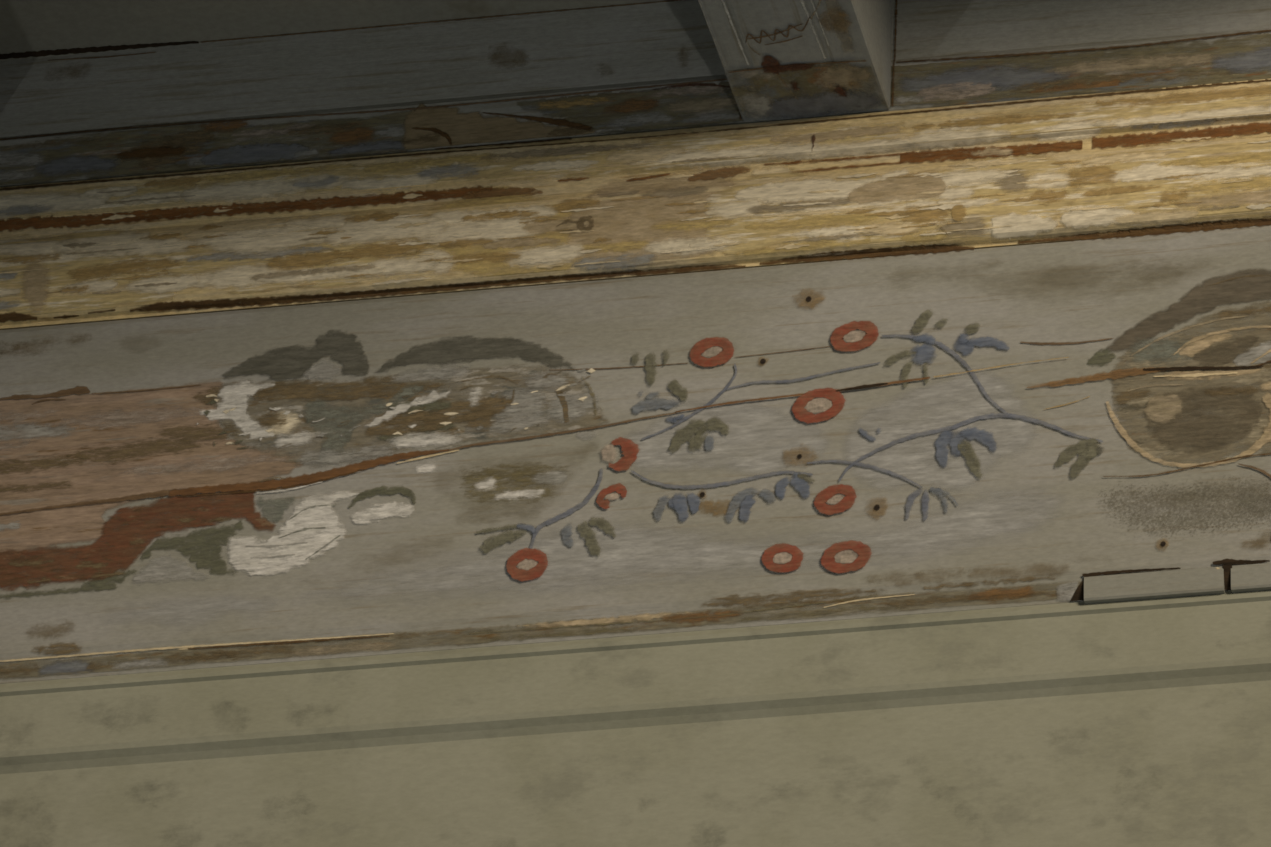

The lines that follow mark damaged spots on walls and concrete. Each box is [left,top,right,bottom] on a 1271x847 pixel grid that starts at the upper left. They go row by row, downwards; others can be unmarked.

peeling [0,0,1271,315]
crack [836,338,1271,409]
crack [0,393,805,516]